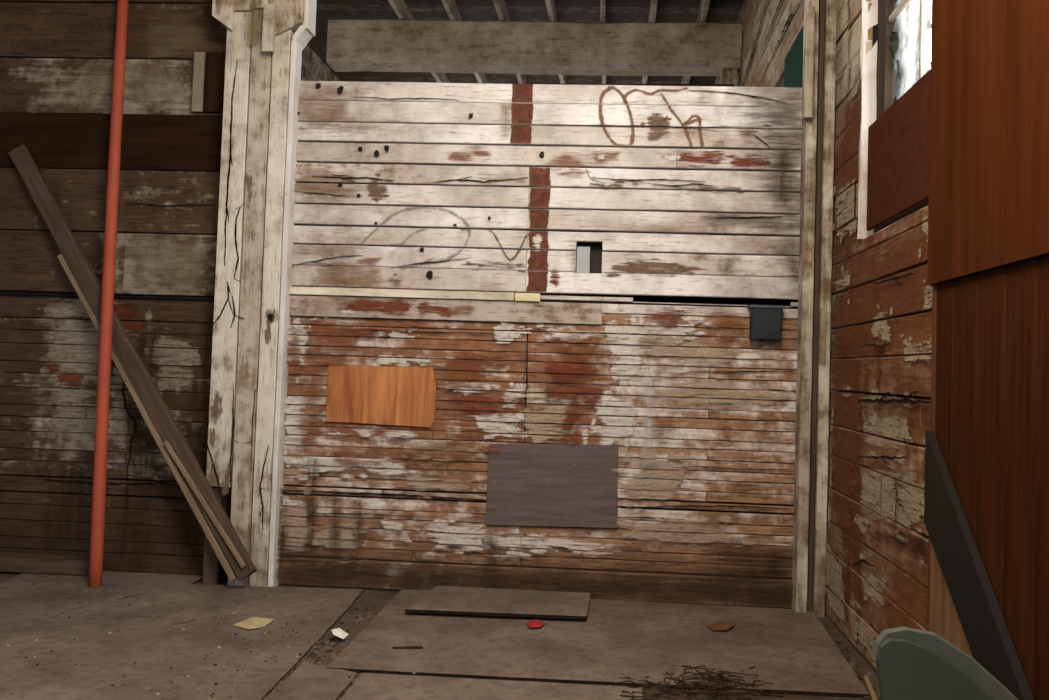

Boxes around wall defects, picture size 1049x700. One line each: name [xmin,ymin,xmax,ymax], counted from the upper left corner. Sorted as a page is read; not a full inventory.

crack [691,0,798,103]
crack [547,124,770,148]
crack [126,60,245,328]
peeling [832,179,858,243]
peeling [602,258,706,277]
peeling [265,309,279,344]
peeling [869,306,932,367]
peeling [279,291,756,564]
peeling [649,379,796,410]
crack [858,391,931,404]
peeling [828,385,929,567]
peeling [825,502,889,668]